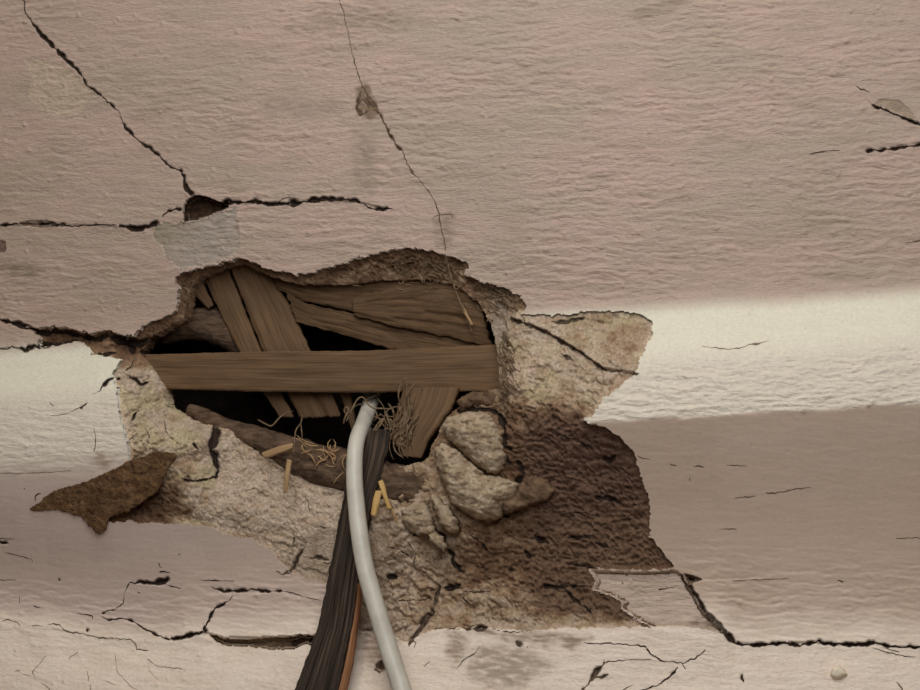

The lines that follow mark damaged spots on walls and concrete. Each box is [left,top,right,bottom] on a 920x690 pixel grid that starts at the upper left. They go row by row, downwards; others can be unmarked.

crack [0,0,193,231]
crack [856,86,920,152]
crack [224,196,392,211]
peeling [151,195,251,321]
spalling [299,323,391,351]
crack [510,317,639,375]
flaking render [30,326,365,584]
flaking render [368,311,718,642]
crack [0,495,331,690]
flaking render [358,594,372,632]
crack [658,585,920,658]
crack [581,642,705,690]